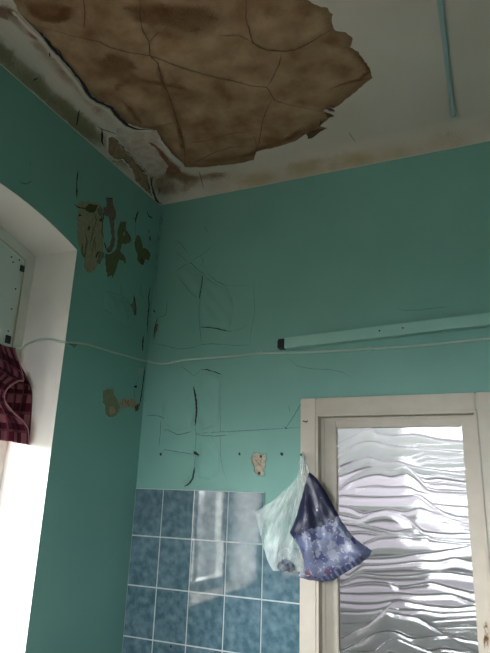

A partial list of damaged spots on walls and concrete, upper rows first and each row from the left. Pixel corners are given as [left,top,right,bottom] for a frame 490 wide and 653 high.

crack [12,0,333,188]
damp [0,0,490,198]
peeling [303,108,335,139]
peeling [106,135,153,197]
spalling [148,142,183,175]
peeling [74,195,152,282]
peeling [101,385,139,420]
crack [182,367,222,487]
spalling [250,451,268,478]